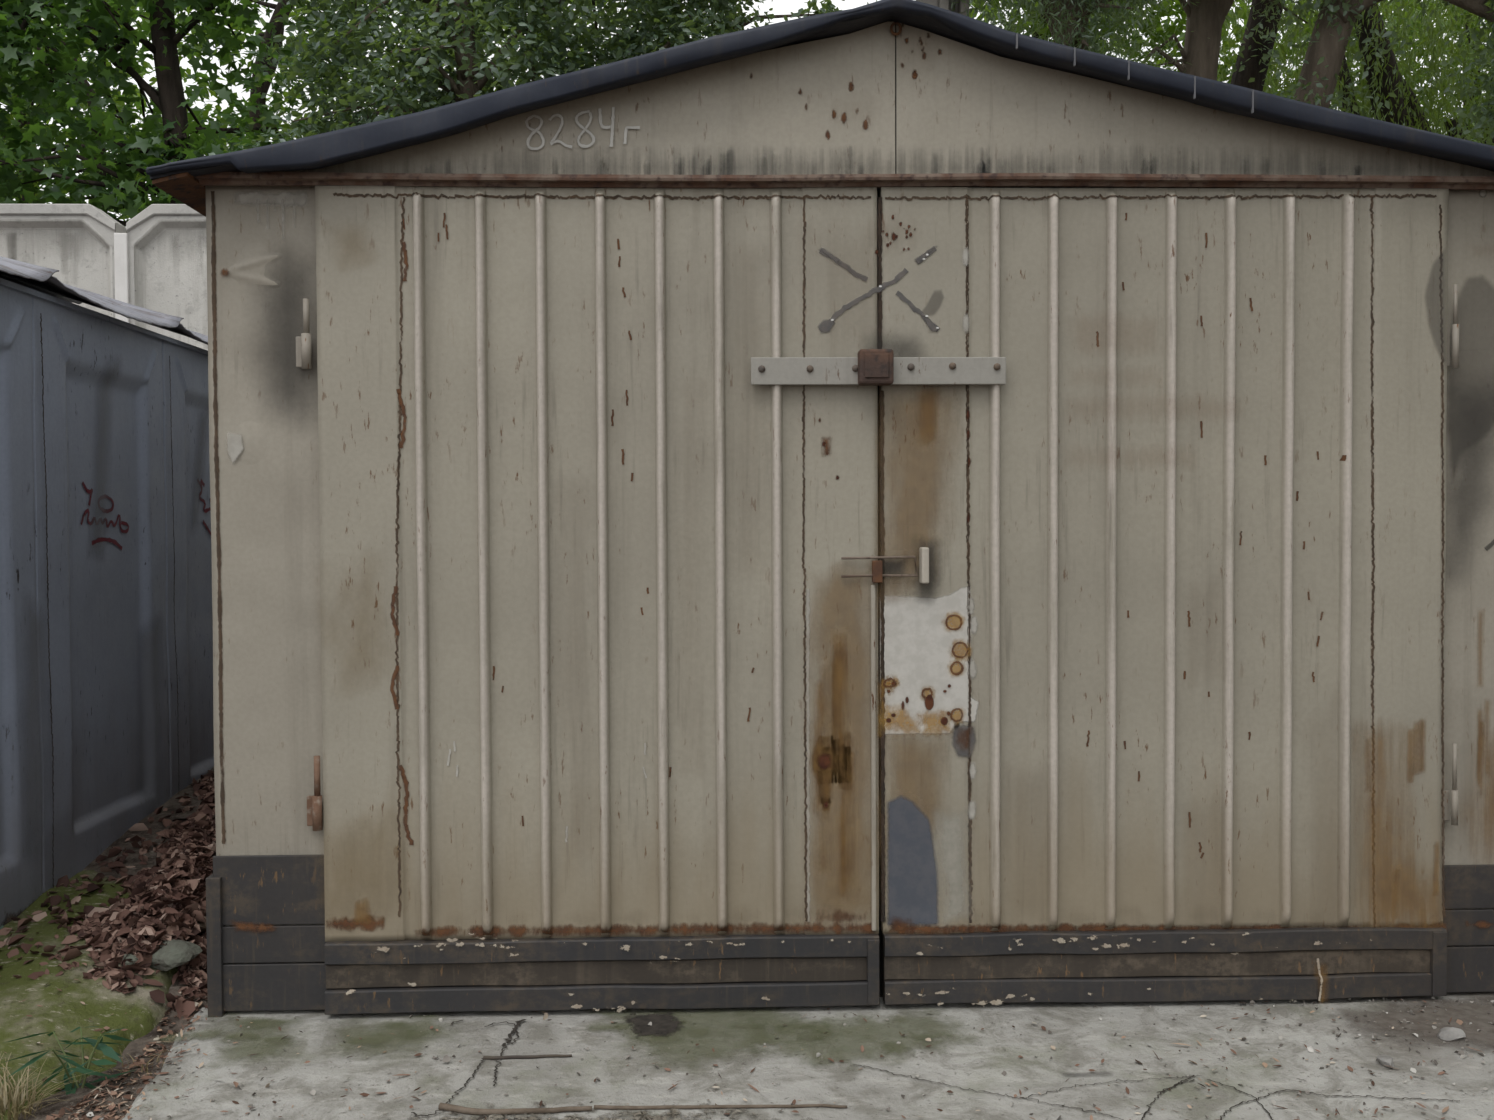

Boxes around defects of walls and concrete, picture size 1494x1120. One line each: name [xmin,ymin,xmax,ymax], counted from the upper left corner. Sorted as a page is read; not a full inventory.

corrosion [875,197,915,349]
peeling [333,192,1437,923]
corrosion [419,390,1285,937]
corrosion [327,904,384,931]
crack [854,1064,1460,1120]